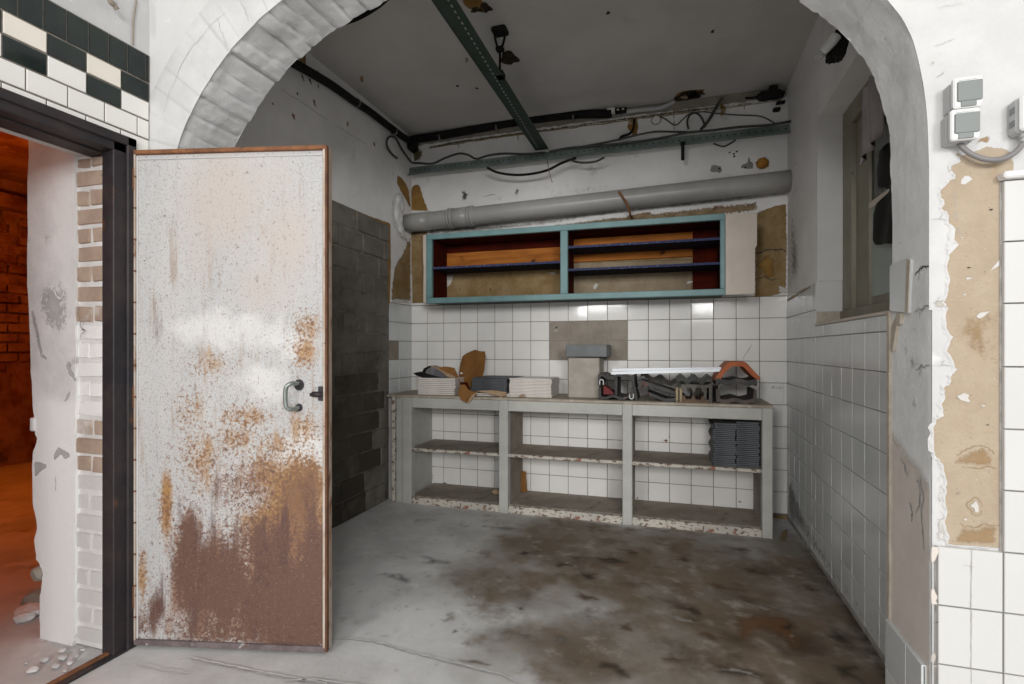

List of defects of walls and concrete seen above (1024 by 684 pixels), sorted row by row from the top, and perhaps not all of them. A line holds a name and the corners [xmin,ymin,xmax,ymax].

flaking render [353,210,427,305]
flaking render [447,269,560,297]
flaking render [565,203,788,302]
peeling [549,320,628,360]
spalling [928,137,1014,562]
flaking render [0,156,102,644]